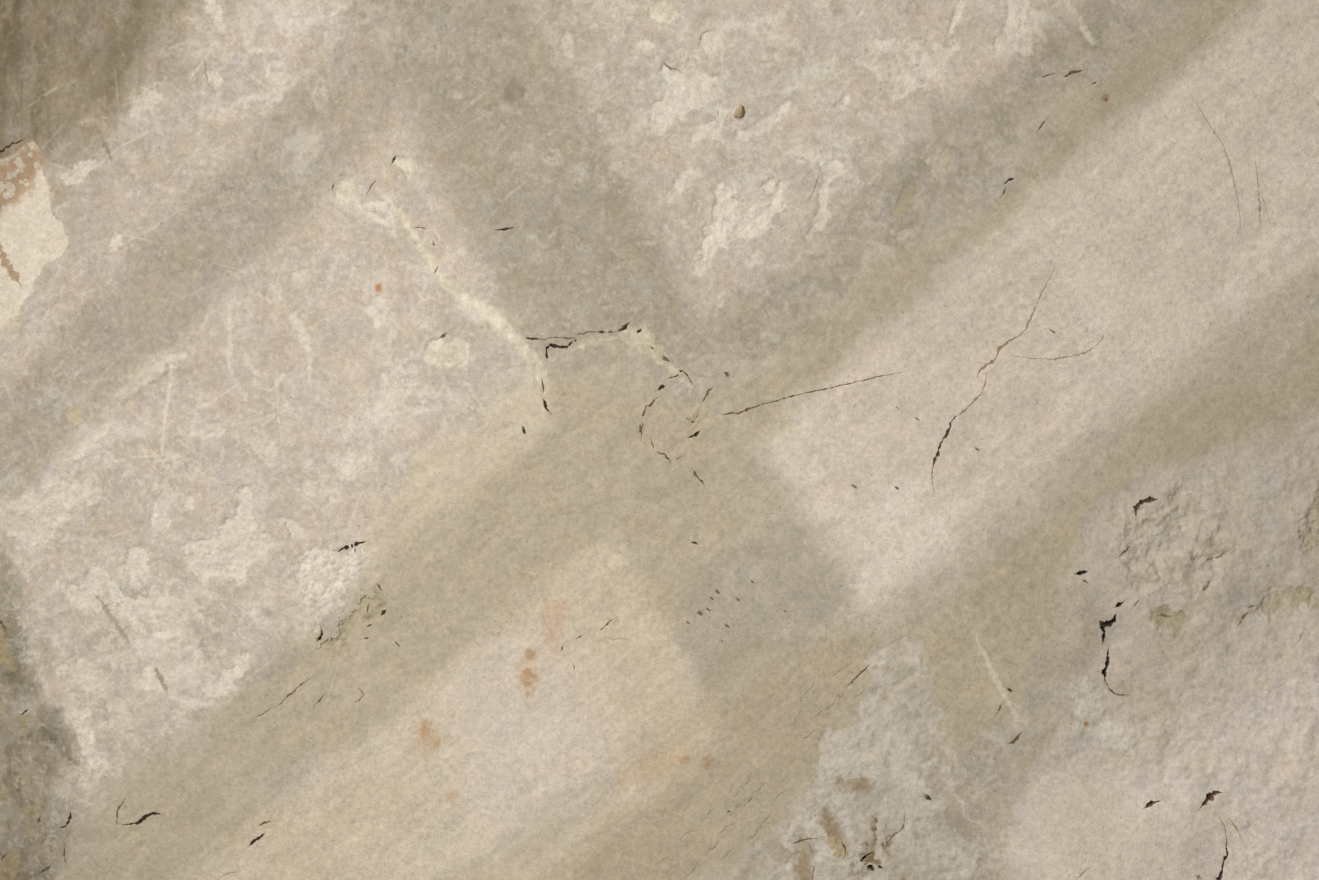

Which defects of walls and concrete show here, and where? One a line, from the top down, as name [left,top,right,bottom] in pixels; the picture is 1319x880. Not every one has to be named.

spalling [109,0,252,133]
peeling [0,125,136,347]
crack [320,142,907,444]
crack [926,265,1110,498]
crack [1070,564,1146,701]
crack [1194,785,1249,880]